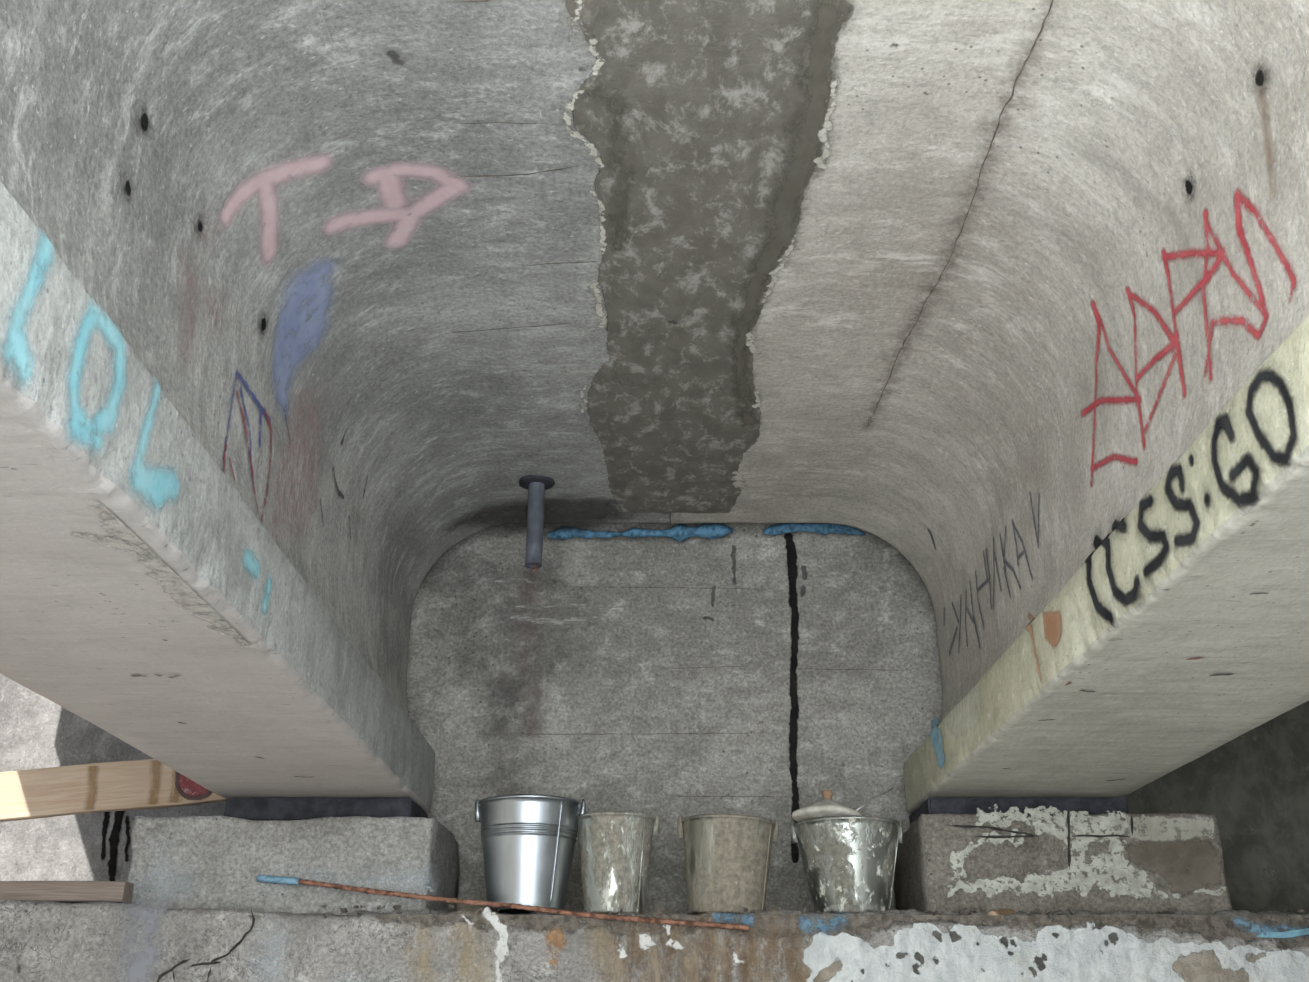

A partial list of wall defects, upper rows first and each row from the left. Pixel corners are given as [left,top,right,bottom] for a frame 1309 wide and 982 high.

spalling [386,50,405,65]
crack [864,0,1053,433]
crack [784,533,800,863]
crack [157,907,255,982]
peeling [338,804,1309,982]